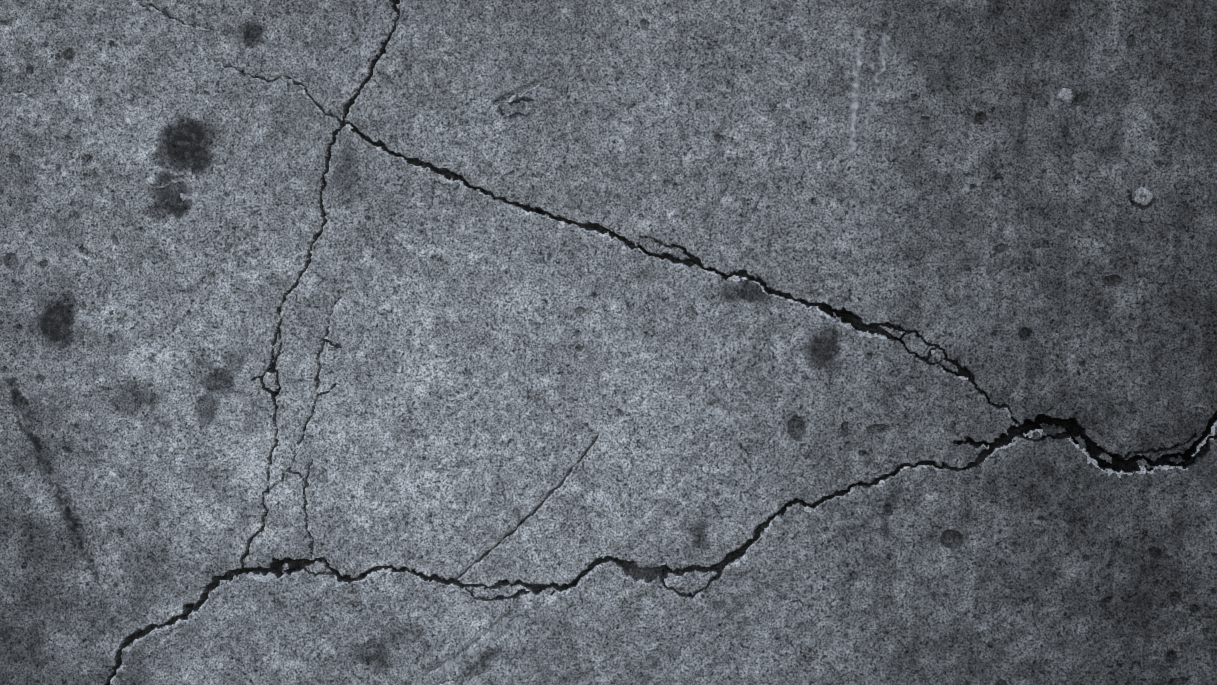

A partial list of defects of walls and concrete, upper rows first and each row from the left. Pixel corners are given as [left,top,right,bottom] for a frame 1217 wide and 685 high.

crack [129,0,209,30]
crack [192,42,279,82]
crack [277,0,1021,425]
crack [250,319,283,481]
crack [292,294,343,462]
crack [104,410,1217,685]